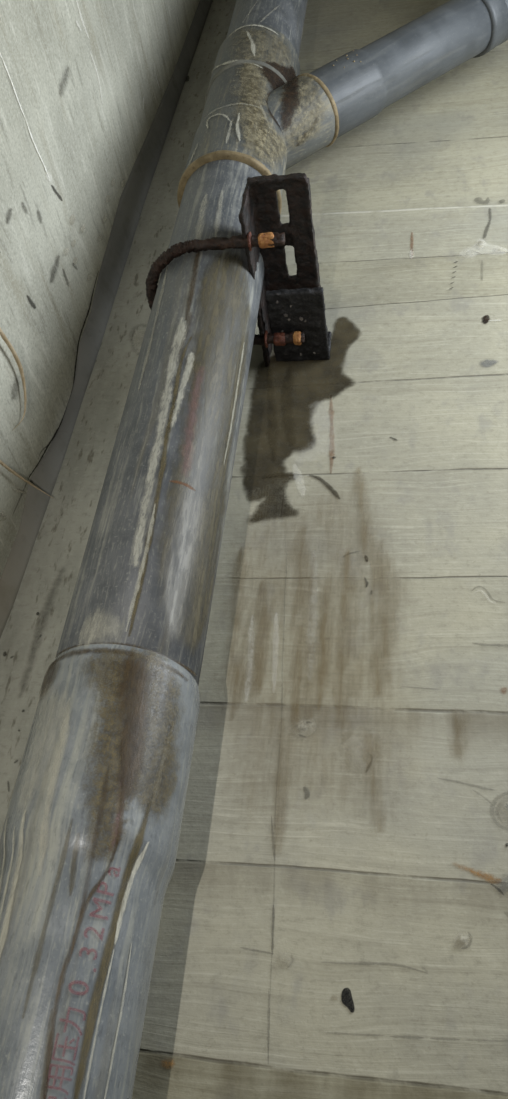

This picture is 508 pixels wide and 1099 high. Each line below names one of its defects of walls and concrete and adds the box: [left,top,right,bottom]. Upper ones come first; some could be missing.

leakage [129,251,360,647]